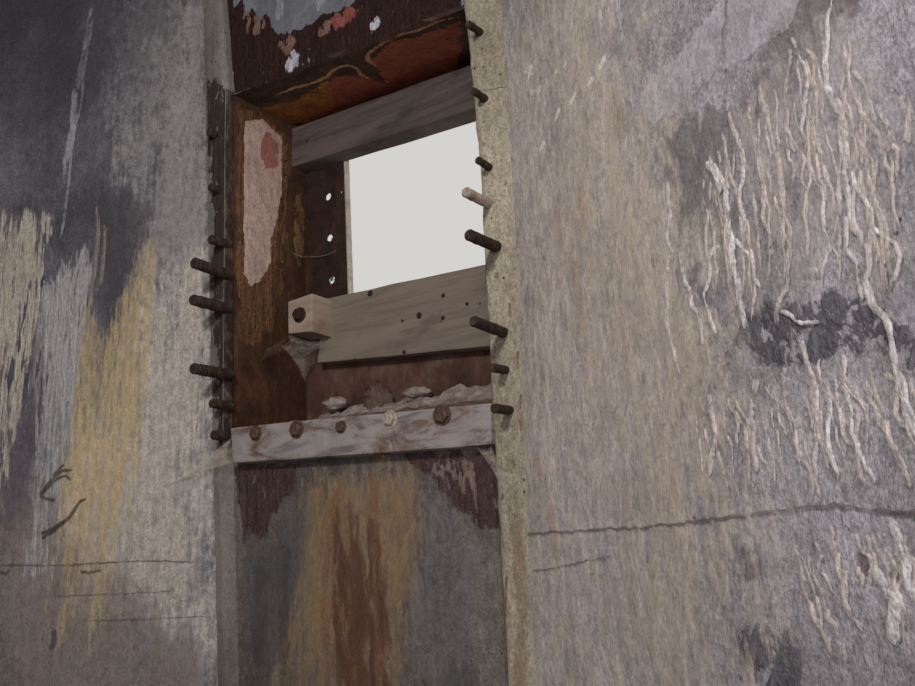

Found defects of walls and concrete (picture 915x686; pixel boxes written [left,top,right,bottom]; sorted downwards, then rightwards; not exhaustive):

water stain [0,0,216,686]
corrosion [207,78,290,368]
peeling [227,0,463,286]
water stain [508,0,915,686]
corrosion [320,474,392,686]
crack [533,556,610,572]
crack [527,501,915,535]